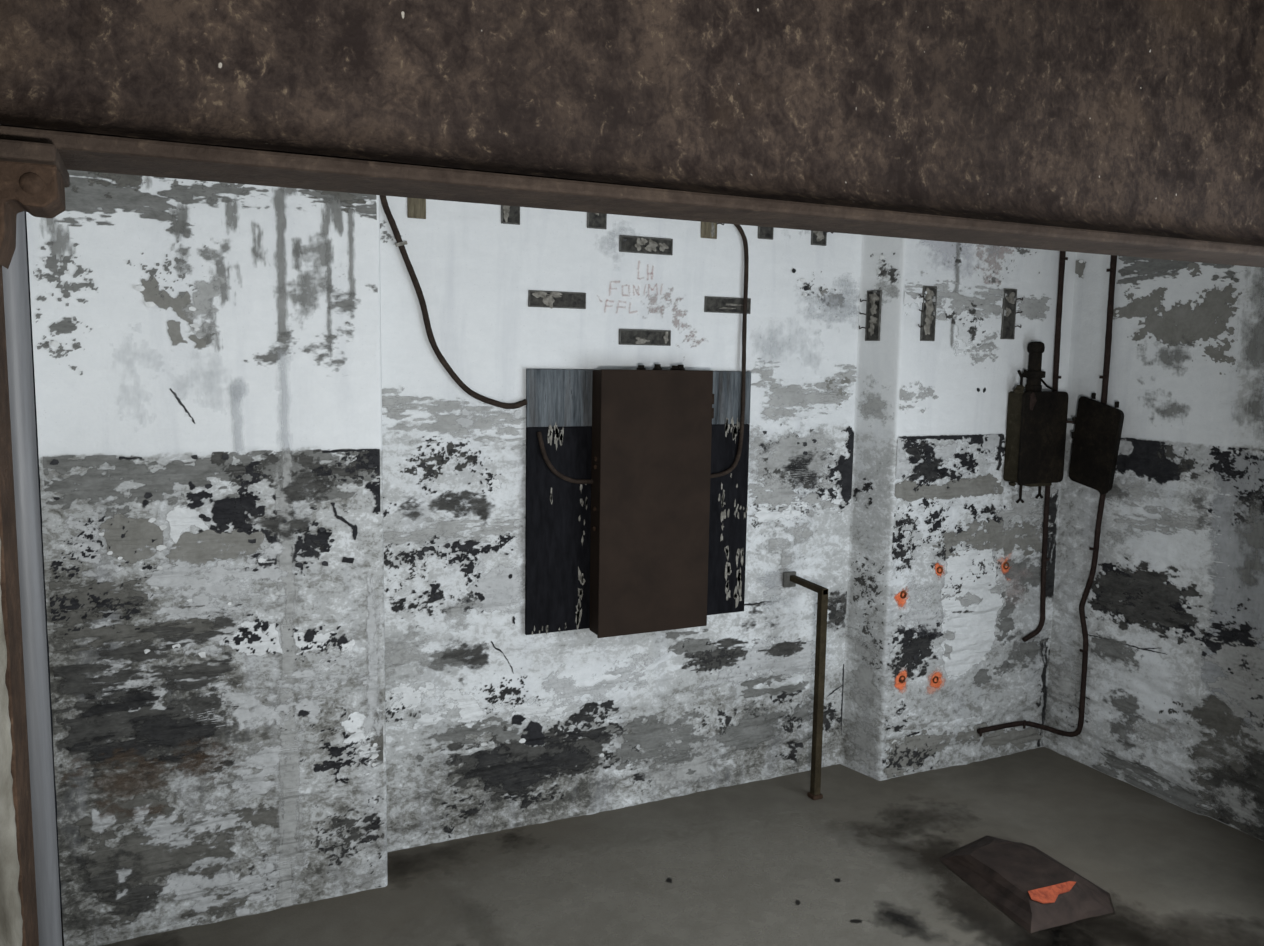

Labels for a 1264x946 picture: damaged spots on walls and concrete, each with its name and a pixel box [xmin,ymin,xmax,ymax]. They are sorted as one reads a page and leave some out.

damp [46,170,393,369]
peeling [870,253,1049,366]
peeling [1113,256,1242,375]
damp [1245,305,1264,367]
peeling [43,388,526,627]
peeling [547,423,564,450]
peeling [532,567,585,635]
peeling [718,358,938,608]
spalling [887,434,1058,687]
peeling [1115,438,1264,754]
spalling [359,713,383,767]
spalling [882,701,1043,778]